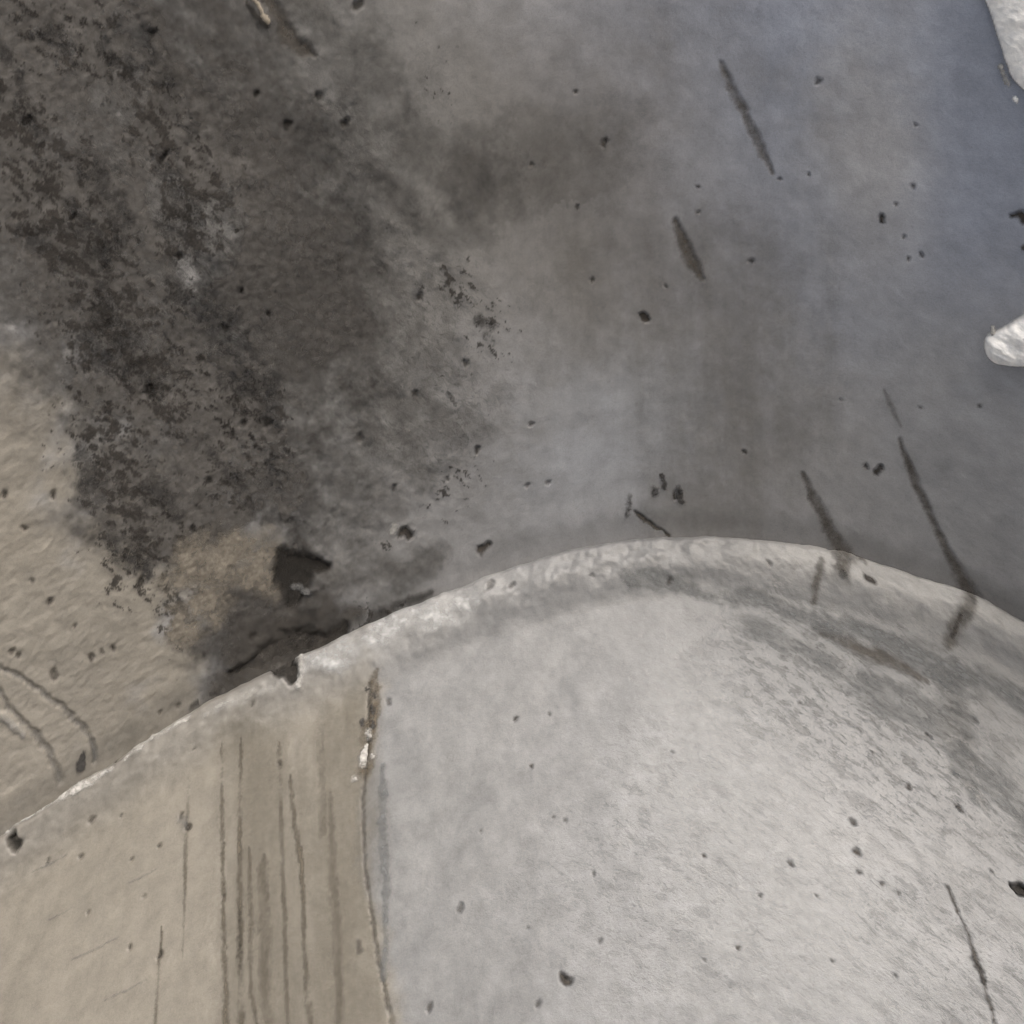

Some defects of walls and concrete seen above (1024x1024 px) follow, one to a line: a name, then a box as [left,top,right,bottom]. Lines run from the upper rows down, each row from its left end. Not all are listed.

leakage [722,69,773,174]
leakage [673,219,703,280]
leakage [0,0,384,691]
leakage [438,257,510,359]
leakage [427,457,486,509]
spalling [273,547,330,612]
leakage [358,597,479,645]
leakage [727,439,1024,713]
leakage [6,770,108,833]
leakage [346,715,375,817]
leakage [220,743,308,1024]
crack [358,764,390,1003]